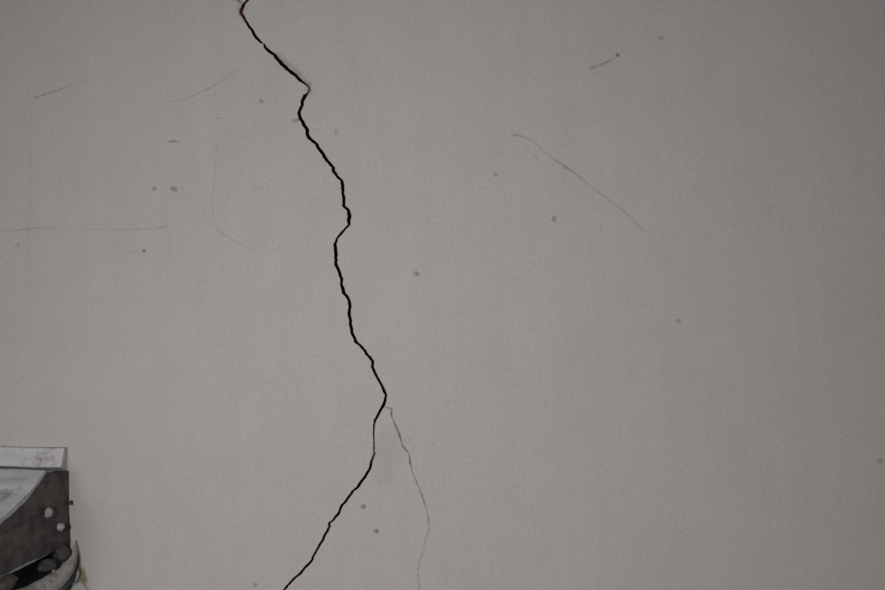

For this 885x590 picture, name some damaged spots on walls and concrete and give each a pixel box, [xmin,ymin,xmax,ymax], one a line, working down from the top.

crack [238,0,411,590]